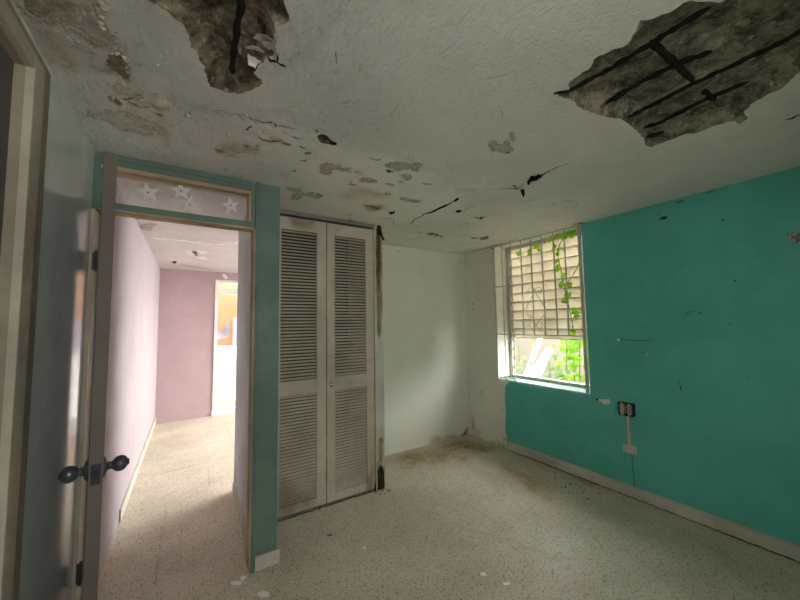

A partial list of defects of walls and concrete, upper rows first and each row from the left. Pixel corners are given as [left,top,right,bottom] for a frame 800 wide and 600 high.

peeling [13,0,165,137]
spalling [149,0,289,94]
spalling [553,0,800,147]
spalling [314,129,333,145]
peeling [488,132,515,153]
peeling [318,157,422,195]
crack [383,198,484,249]
leakage [374,461,384,492]